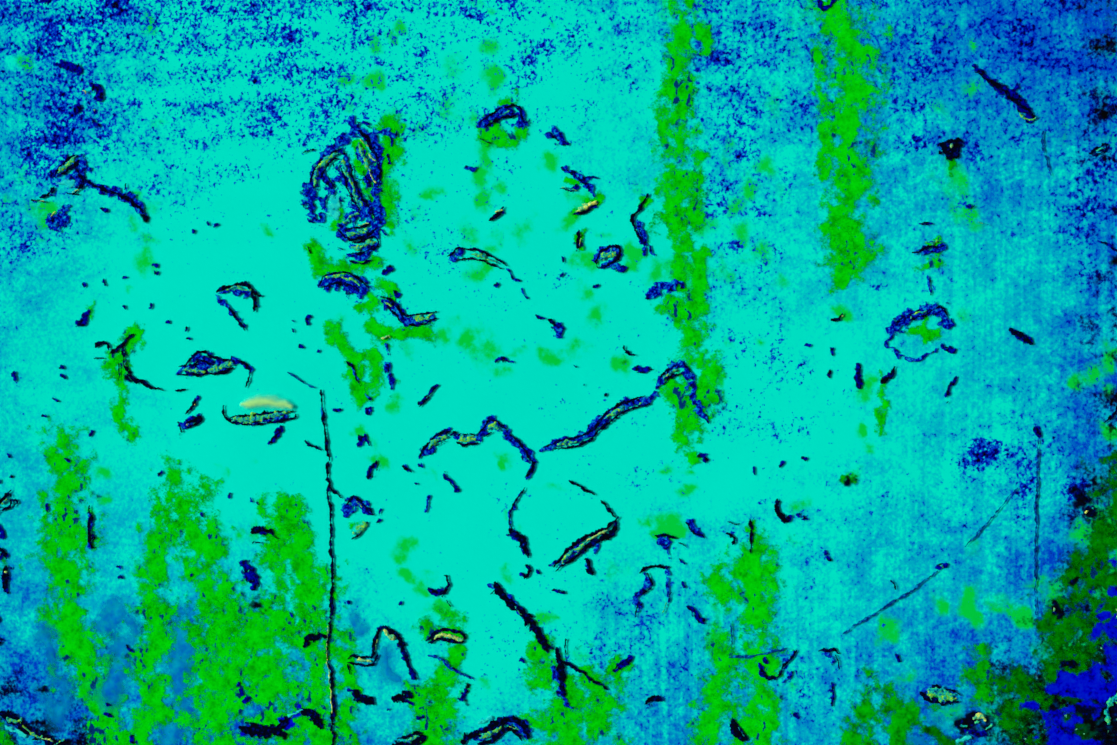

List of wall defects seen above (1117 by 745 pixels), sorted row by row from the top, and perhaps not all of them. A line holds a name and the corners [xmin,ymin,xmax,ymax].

peeling [475,88,531,150]
peeling [544,125,569,146]
crack [78,179,150,223]
peeling [300,115,437,330]
peeling [175,326,254,433]
peeling [381,335,395,390]
crack [569,480,616,518]
crack [287,372,343,745]
crack [487,458,608,709]
damp [37,678,71,727]
damp [97,598,140,704]
damp [159,608,197,745]